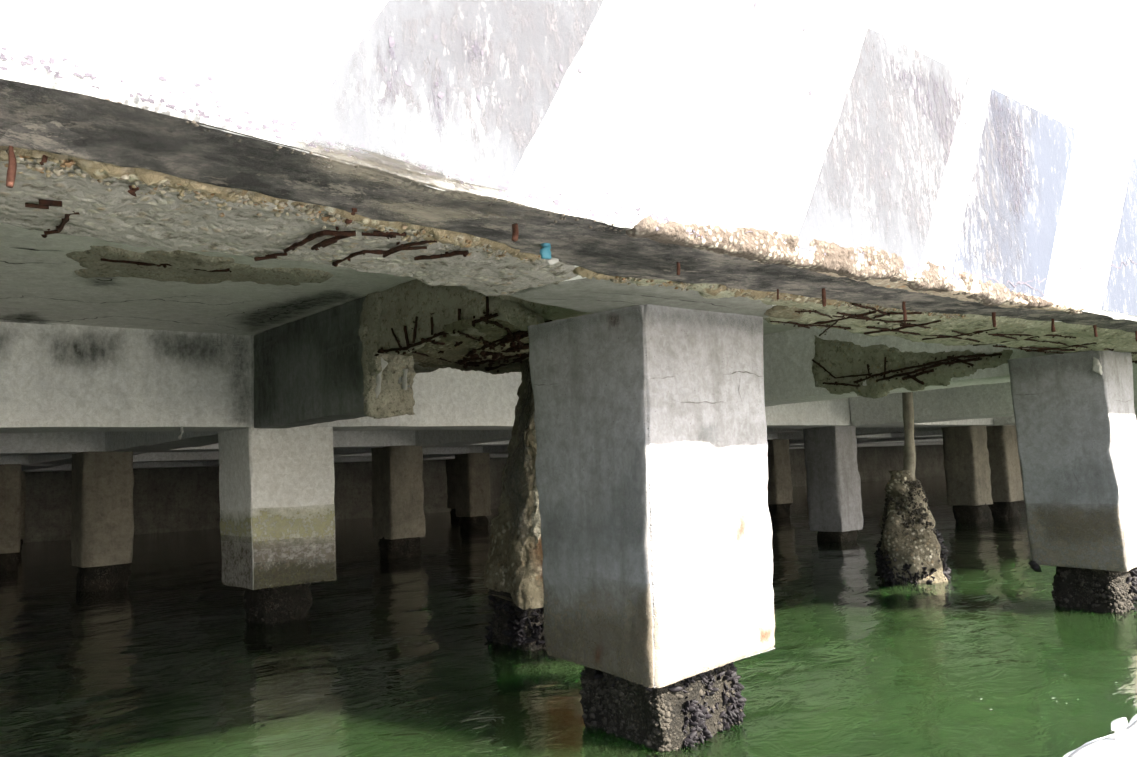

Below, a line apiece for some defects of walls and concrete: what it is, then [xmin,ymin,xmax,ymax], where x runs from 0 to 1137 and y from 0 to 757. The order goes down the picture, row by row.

spalling [0,141,1137,419]
damp [57,337,112,362]
spalling [531,474,541,545]
damp [221,536,336,590]